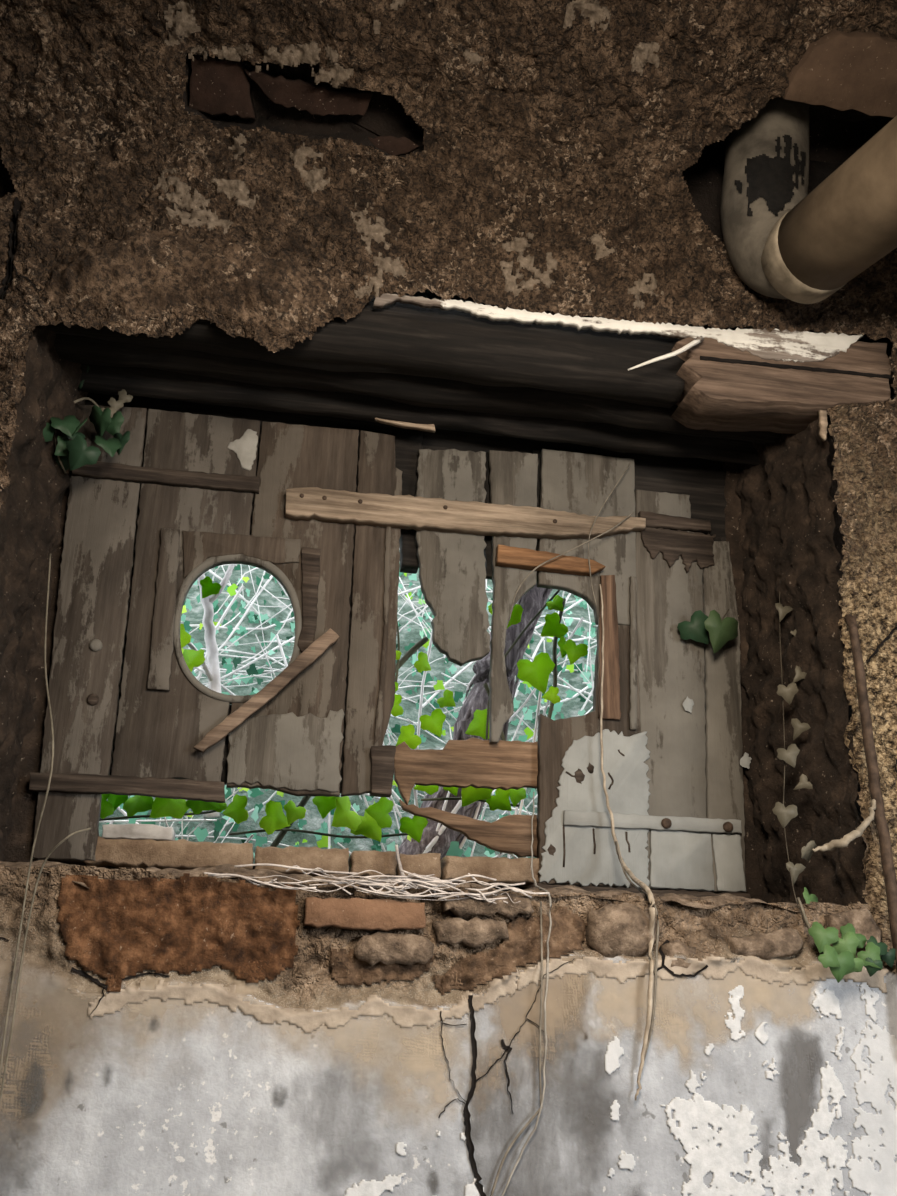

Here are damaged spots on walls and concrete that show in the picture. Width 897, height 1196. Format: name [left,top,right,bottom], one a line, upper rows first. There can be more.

spalling [164,0,424,194]
spalling [57,873,897,1196]
crack [438,959,574,1196]
damp [471,952,820,1196]